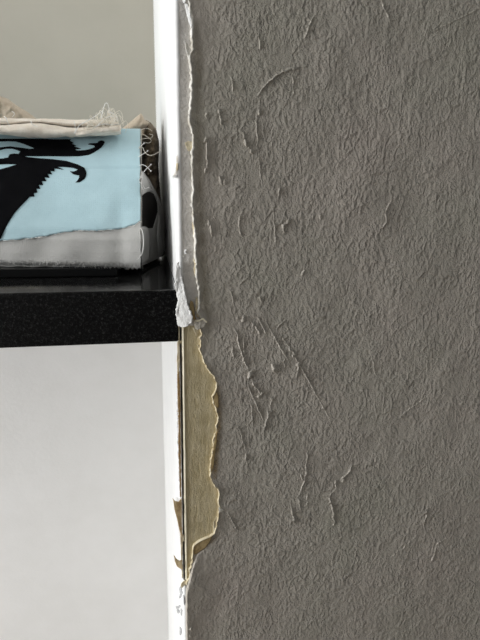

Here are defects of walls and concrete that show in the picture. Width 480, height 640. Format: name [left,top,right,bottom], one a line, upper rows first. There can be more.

peeling [173,0,224,588]